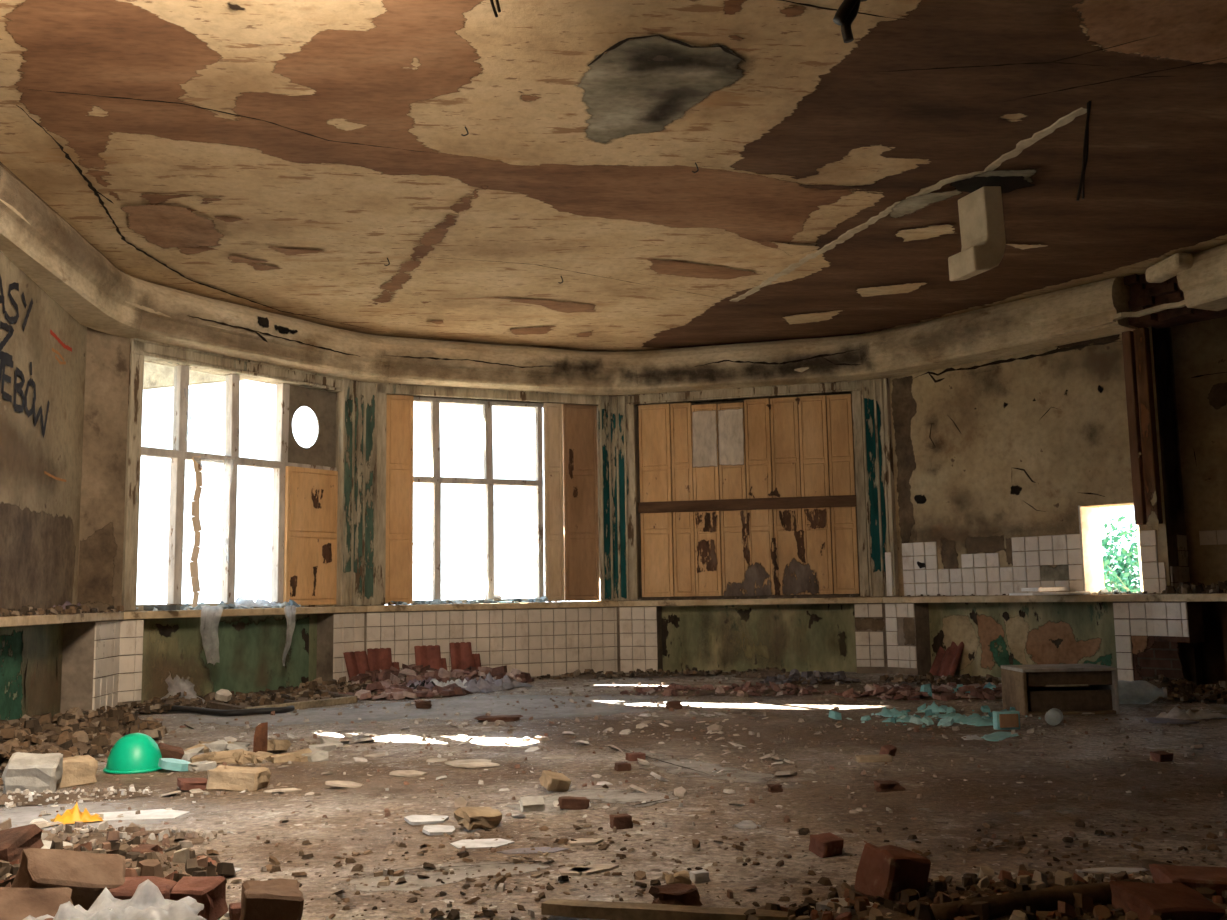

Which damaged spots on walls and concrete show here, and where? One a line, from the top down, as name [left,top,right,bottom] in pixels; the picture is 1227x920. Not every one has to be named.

water stain [578,35,745,144]
peeling [2,0,1227,350]
water stain [533,347,868,385]
spalling [0,502,117,611]
peeling [313,395,375,599]
peeling [598,409,629,600]
peeling [695,512,718,573]
peeling [692,408,744,467]
peeling [724,486,826,622]
spalling [864,376,927,572]
peeling [941,535,1018,569]
peeling [932,610,1112,671]